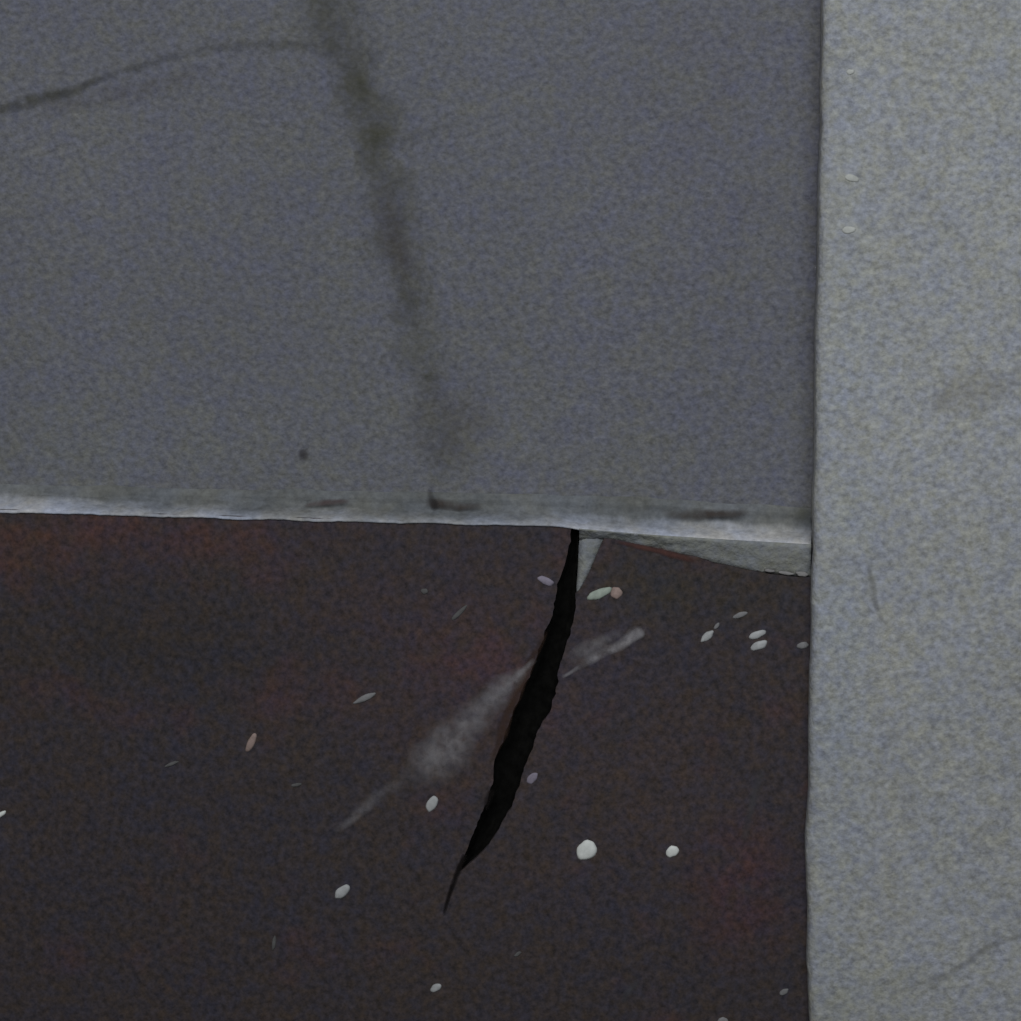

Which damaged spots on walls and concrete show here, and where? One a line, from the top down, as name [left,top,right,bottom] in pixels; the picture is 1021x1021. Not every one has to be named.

crack [445,529,579,909]